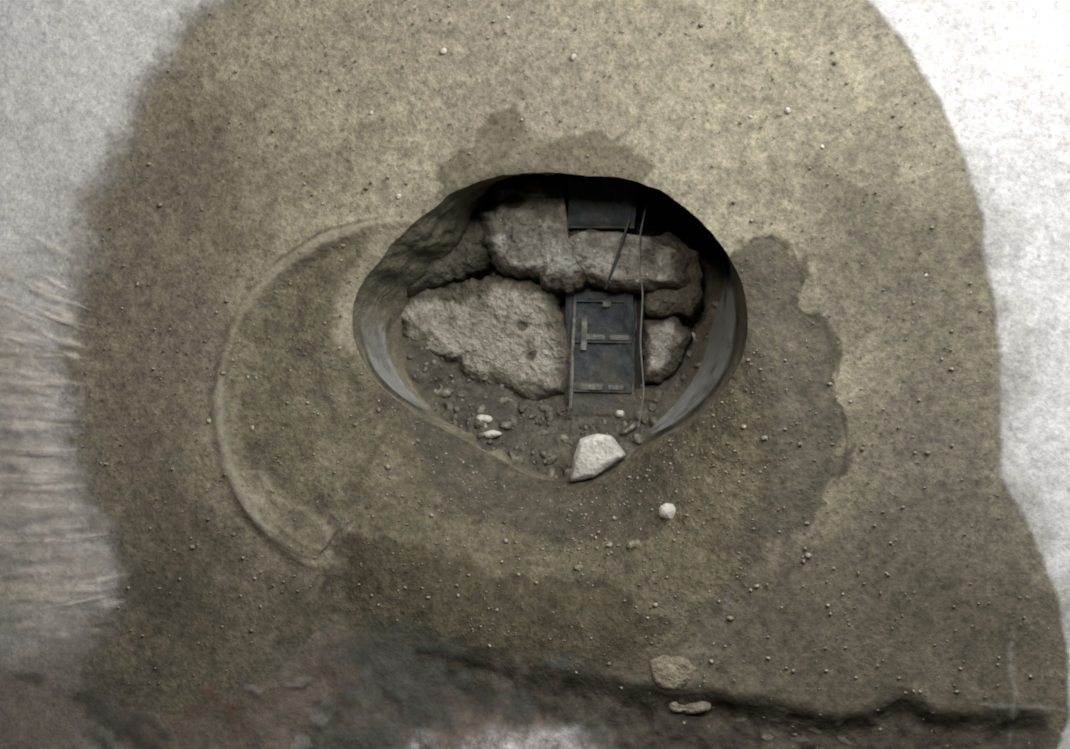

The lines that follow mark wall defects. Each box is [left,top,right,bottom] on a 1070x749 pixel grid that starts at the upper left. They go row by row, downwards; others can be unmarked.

leakage [438,105,652,199]
hole [352,172,570,481]
leakage [854,215,970,352]
efflorescence [0,447,106,604]
leakage [149,557,233,674]
leakage [505,650,663,693]
leakage [667,569,1033,723]
leakage [861,368,1068,749]
leakage [460,732,574,749]